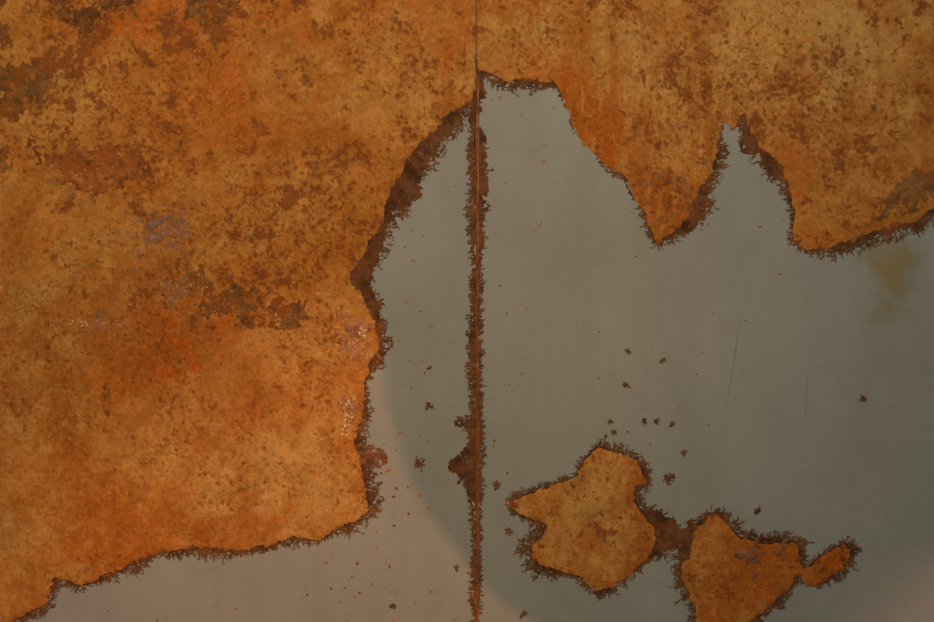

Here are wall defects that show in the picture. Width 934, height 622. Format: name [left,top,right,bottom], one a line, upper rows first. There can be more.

rust [474,0,934,263]
peeling [871,161,934,223]
rust [0,0,494,622]
peeling [186,268,313,334]
rust [504,419,862,622]